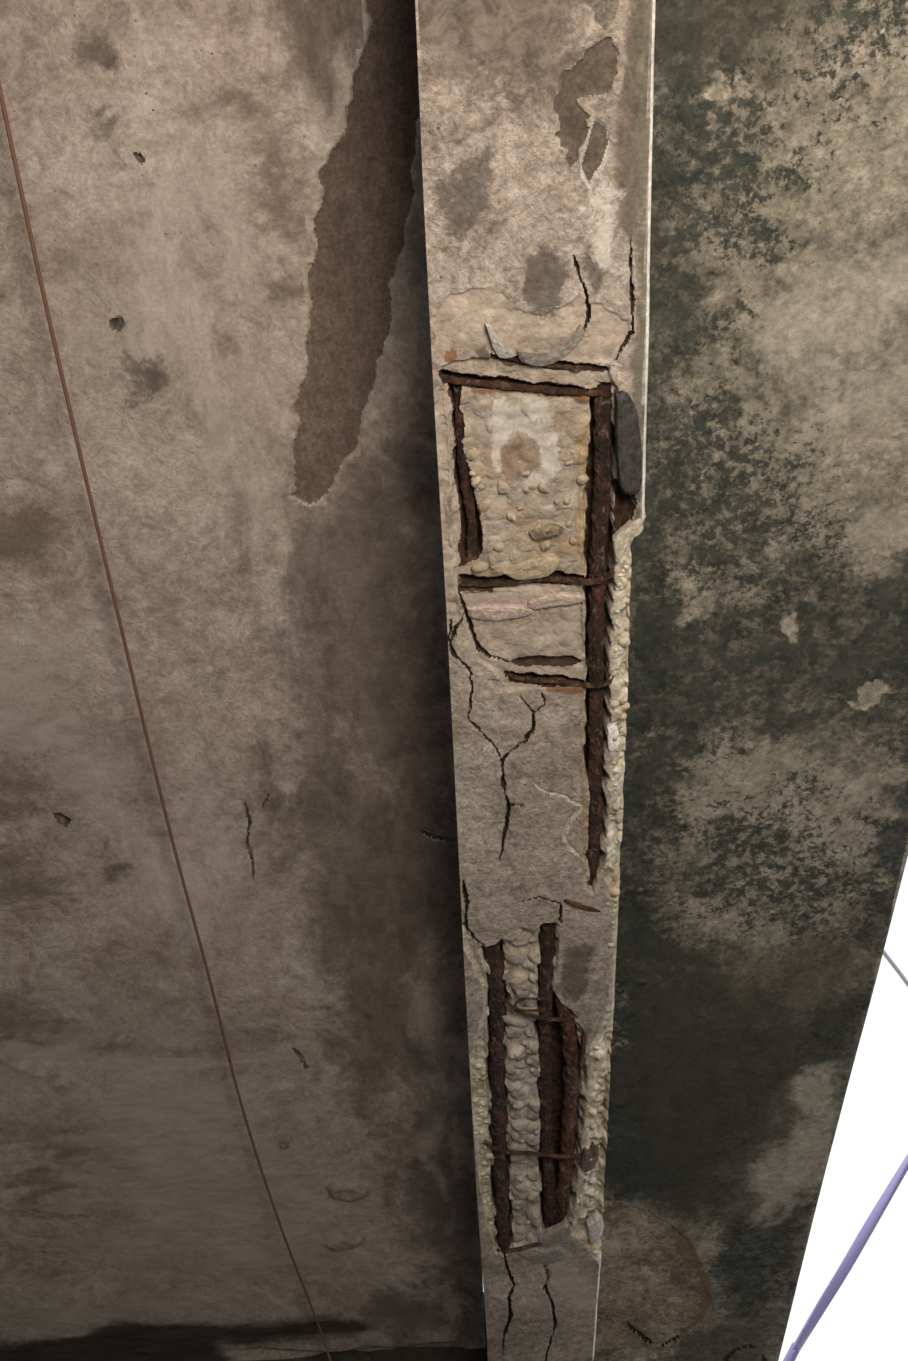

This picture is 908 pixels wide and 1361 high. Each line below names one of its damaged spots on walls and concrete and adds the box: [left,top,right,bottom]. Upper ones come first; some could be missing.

peeling [552,0,621,188]
peeling [287,0,420,507]
corrosion [473,375,594,402]
crack [572,255,591,337]
crack [614,234,636,361]
peeling [755,237,908,448]
corrosion [575,435,588,566]
water stain [264,448,477,1251]
crack [448,586,545,860]
corrosion [547,675,589,872]
spalling [430,287,712,1361]
water stain [587,0,908,1361]